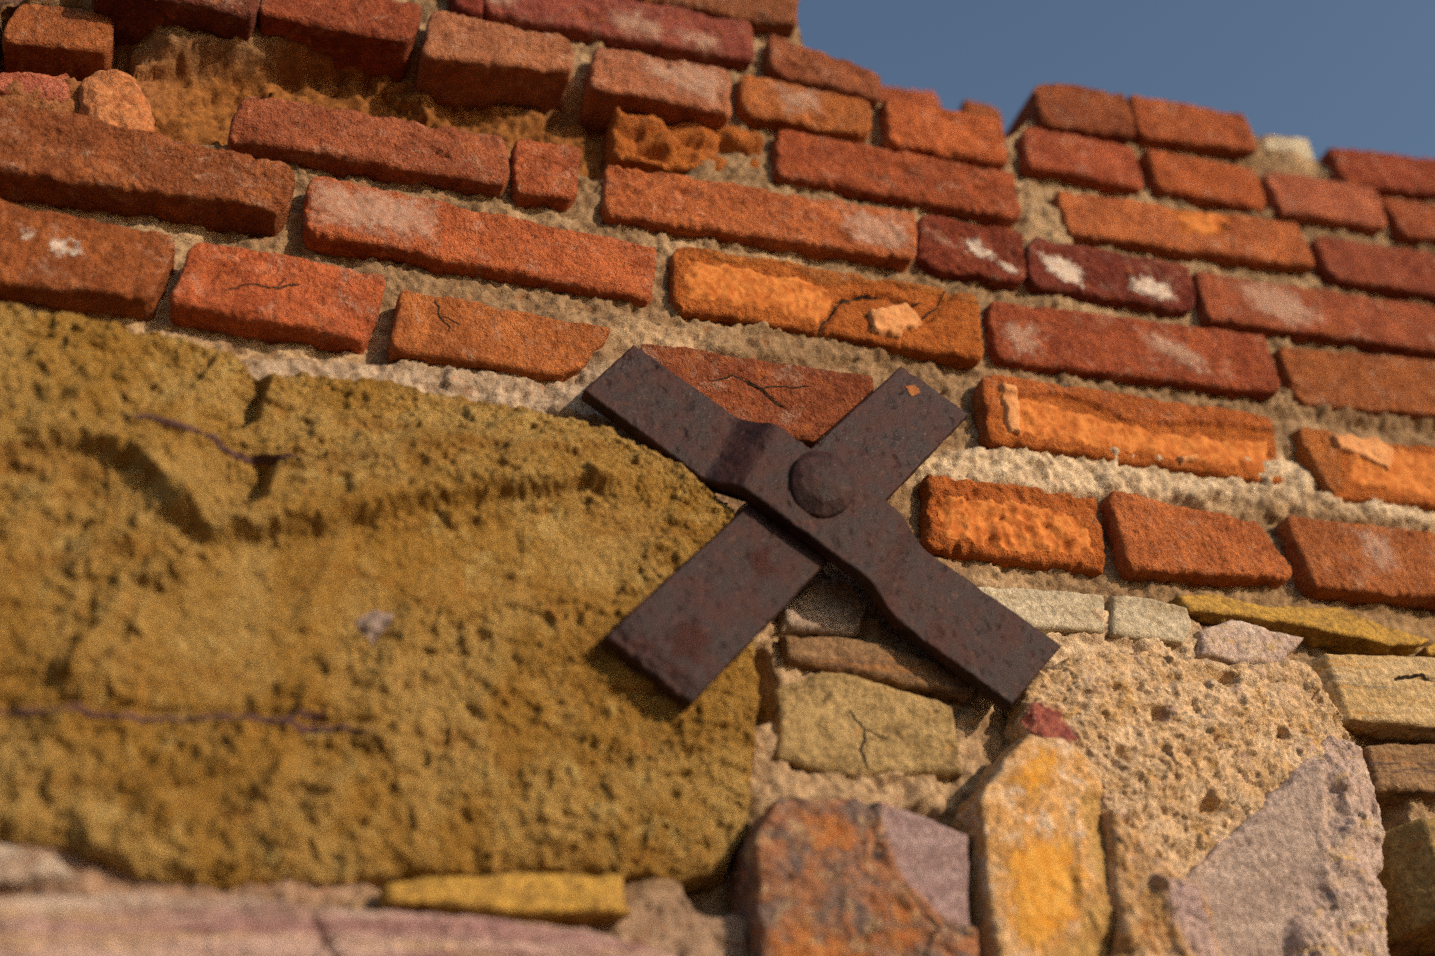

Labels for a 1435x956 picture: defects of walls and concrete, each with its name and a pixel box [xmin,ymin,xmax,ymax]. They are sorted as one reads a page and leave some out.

damp [1038,252,1084,287]
damp [1130,276,1177,300]
crack [124,413,304,466]
crack [0,702,380,734]